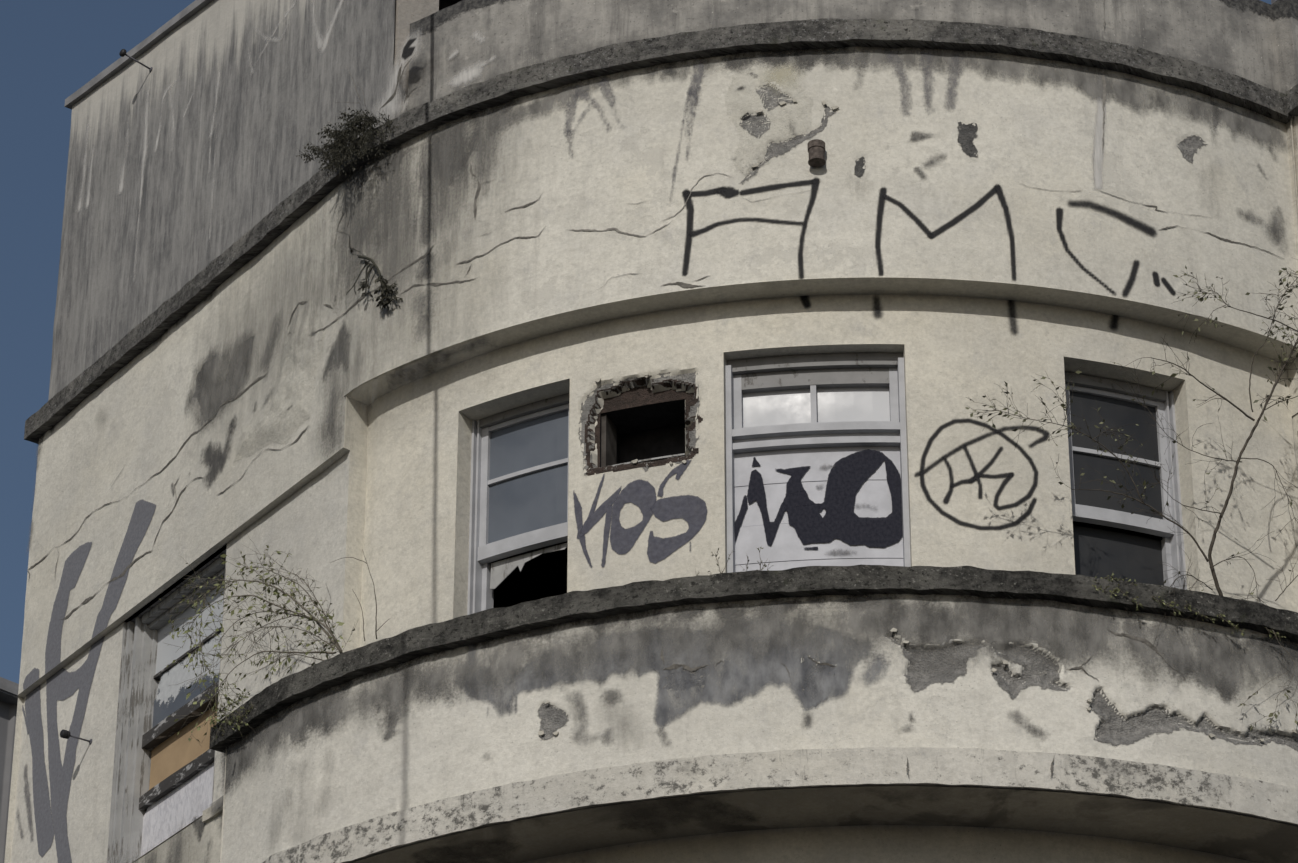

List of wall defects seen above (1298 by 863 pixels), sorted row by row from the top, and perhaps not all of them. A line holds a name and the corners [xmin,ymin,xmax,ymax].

water stain [312,0,343,52]
water stain [78,126,93,210]
water stain [135,84,191,261]
peeling [738,84,839,185]
crack [288,164,811,334]
peeling [188,333,255,426]
water stain [262,319,280,368]
crack [28,374,309,620]
peeling [460,619,885,740]
flaking render [888,628,1071,736]
flaking render [1086,690,1298,751]